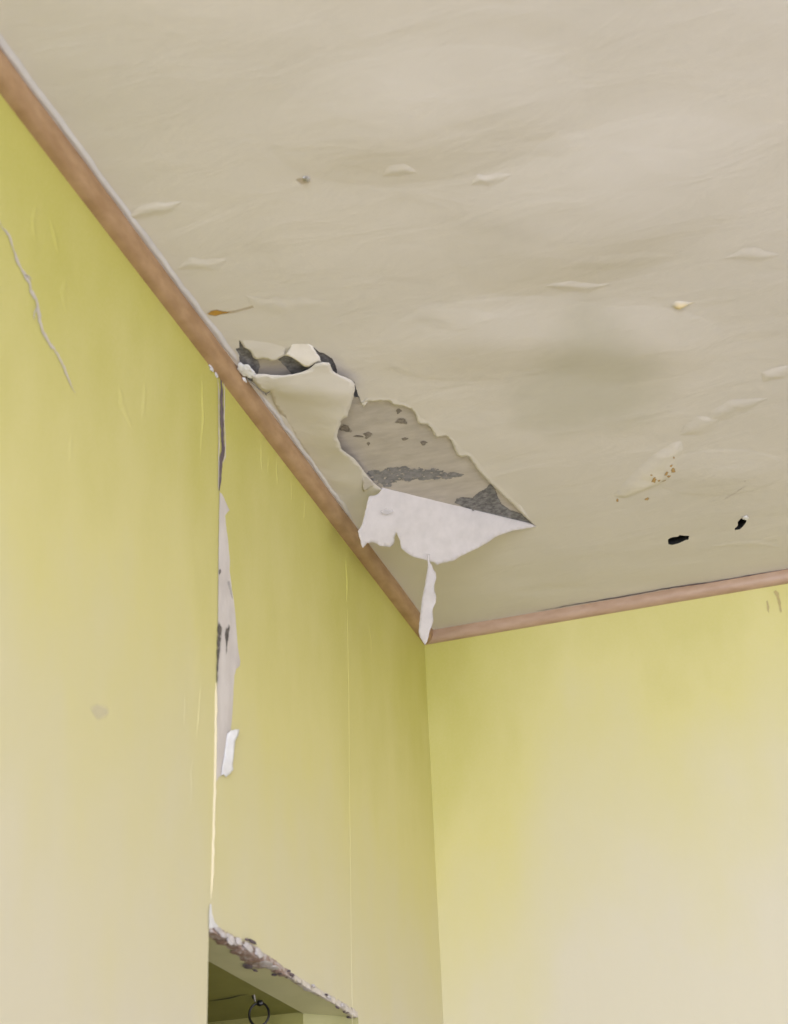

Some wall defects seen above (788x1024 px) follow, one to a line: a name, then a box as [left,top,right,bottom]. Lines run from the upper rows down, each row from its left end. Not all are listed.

crack [0,223,75,392]
peeling [236,340,337,394]
peeling [337,396,535,644]
peeling [209,493,358,1018]